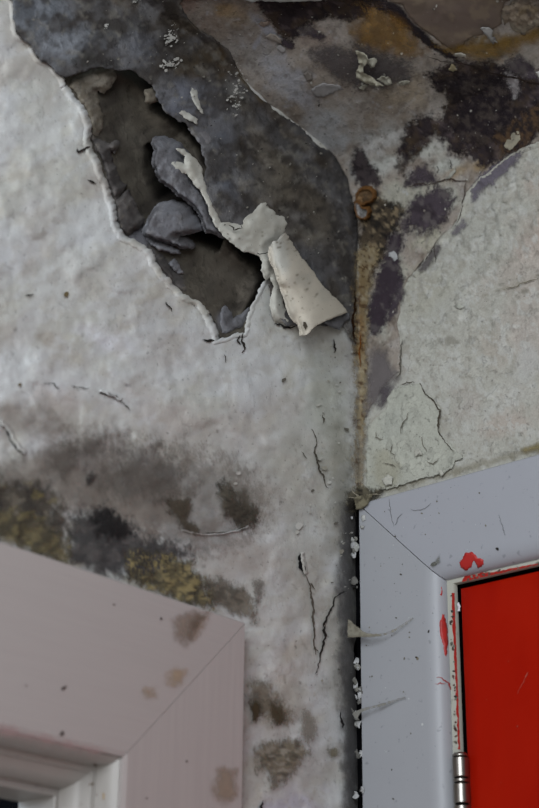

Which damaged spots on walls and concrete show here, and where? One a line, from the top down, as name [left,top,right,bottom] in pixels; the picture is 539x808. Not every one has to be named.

damp [225,62,248,117]
crack [427,56,539,85]
damp [255,0,539,335]
flaking render [6,0,539,419]
rust [350,244,379,488]
crack [396,342,452,465]
damp [216,477,258,530]
damp [196,575,264,624]
crack [298,552,344,674]
damp [249,680,293,725]
damp [254,709,317,788]